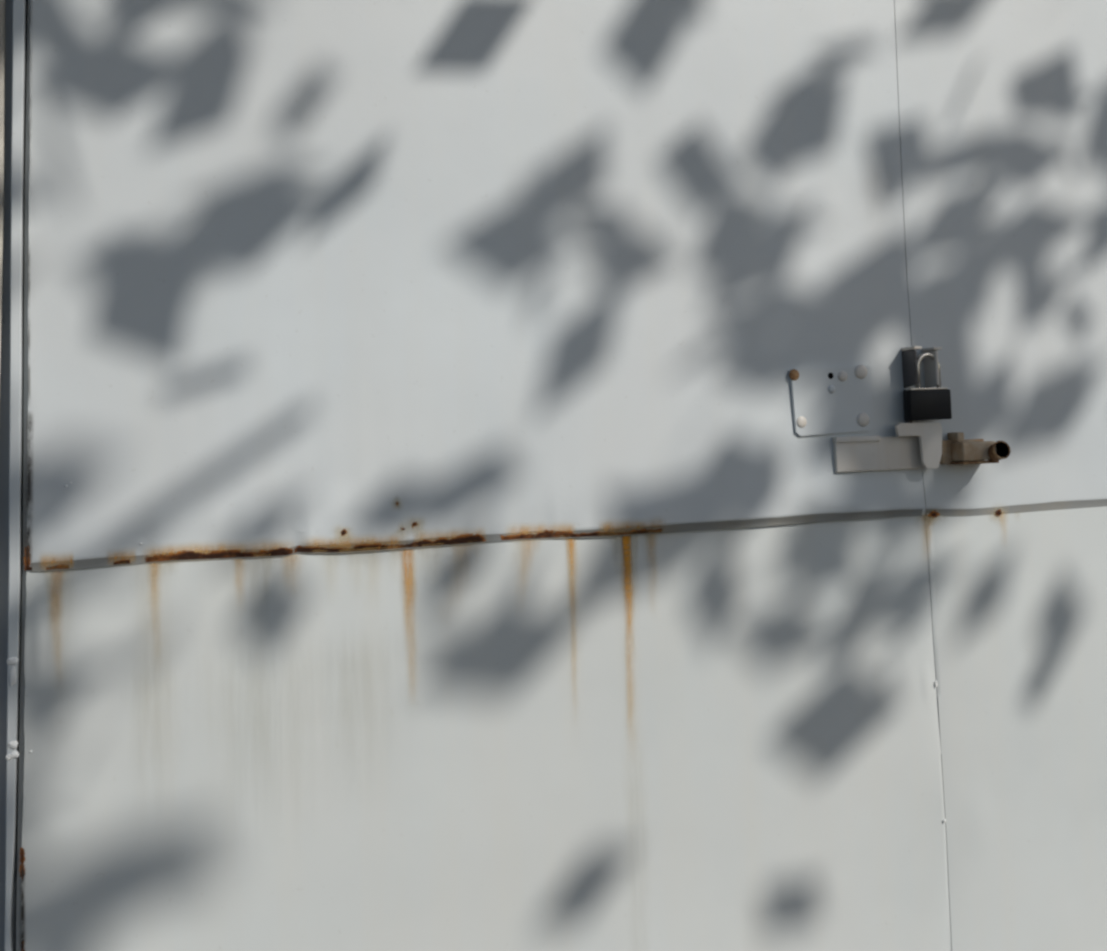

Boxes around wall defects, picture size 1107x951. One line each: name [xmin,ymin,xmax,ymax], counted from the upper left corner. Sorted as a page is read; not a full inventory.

rust [23,528,32,571]
rust [145,529,486,594]
rust [501,526,662,618]